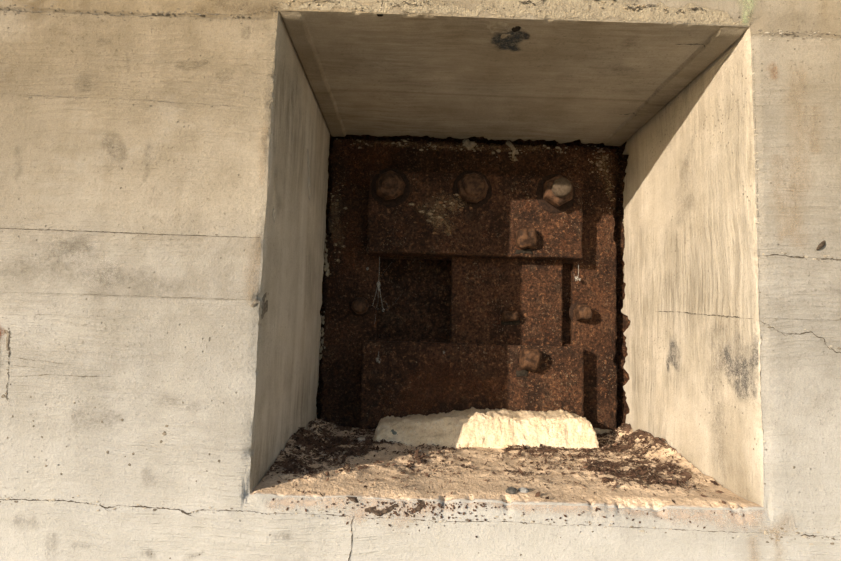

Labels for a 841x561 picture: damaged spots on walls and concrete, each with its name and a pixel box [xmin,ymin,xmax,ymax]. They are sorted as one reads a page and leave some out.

crack [380,0,429,10]
spalling [80,0,841,41]
crack [655,311,841,353]
crack [0,495,840,561]